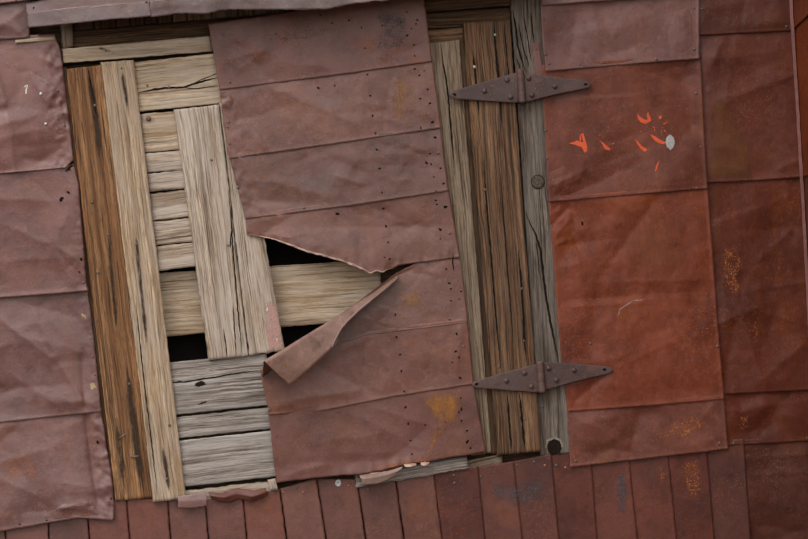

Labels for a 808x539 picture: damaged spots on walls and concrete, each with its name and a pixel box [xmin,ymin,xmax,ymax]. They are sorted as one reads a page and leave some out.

crack [139,74,217,93]
crack [484,166,559,368]
peeling [262,275,399,385]